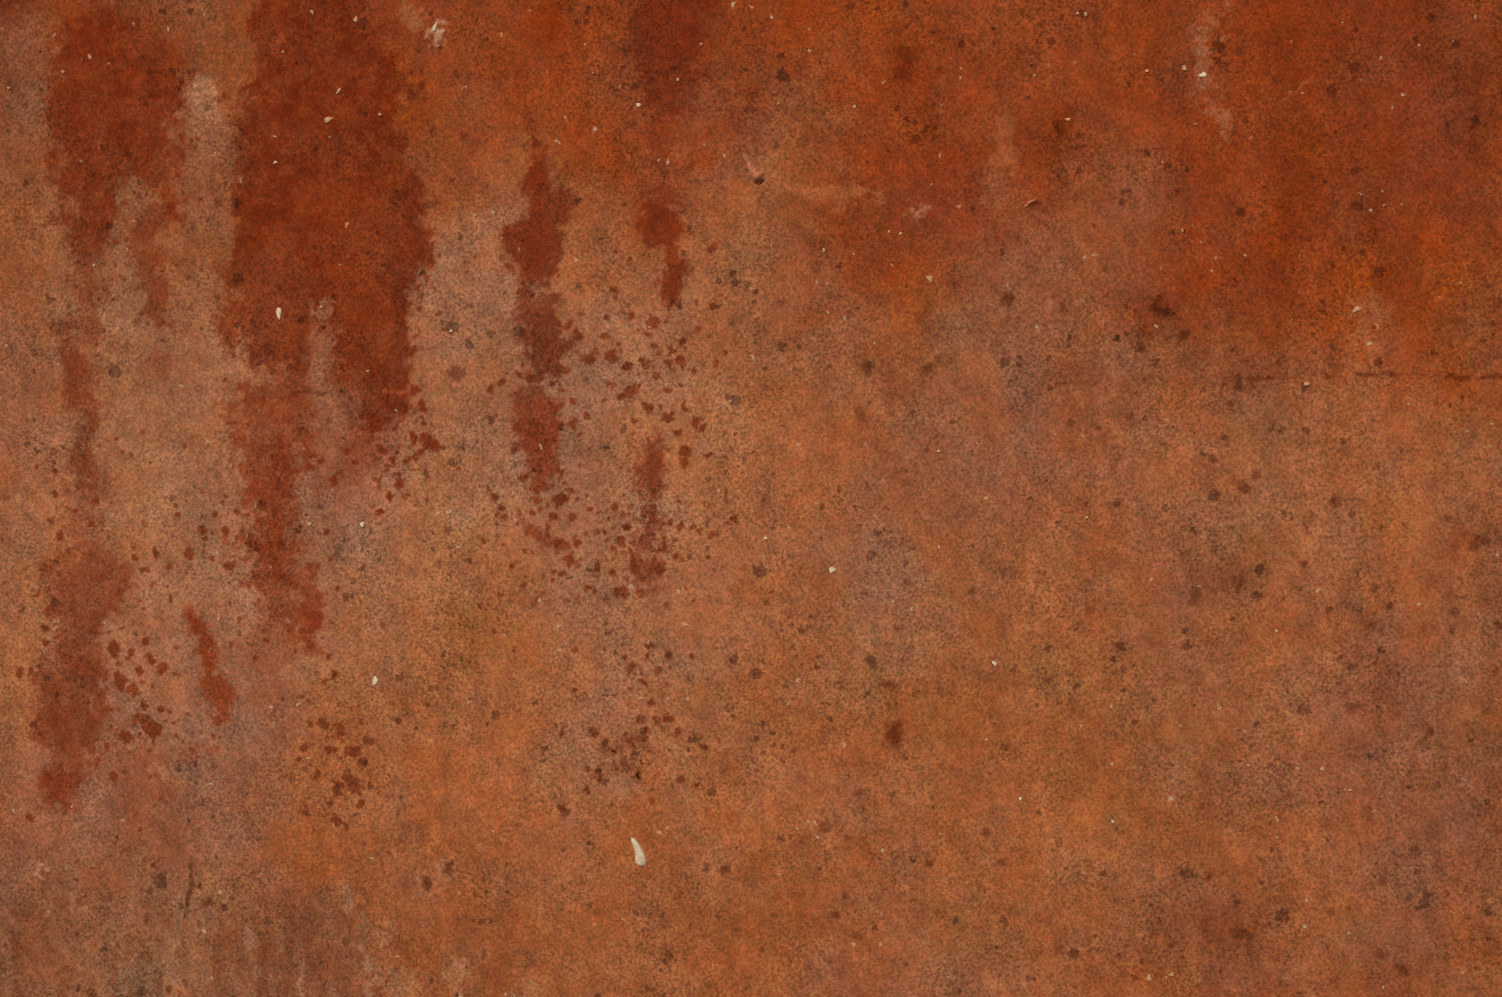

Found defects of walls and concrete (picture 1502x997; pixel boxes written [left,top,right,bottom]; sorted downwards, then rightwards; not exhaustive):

rust [8,0,452,852]
rust [479,0,740,603]